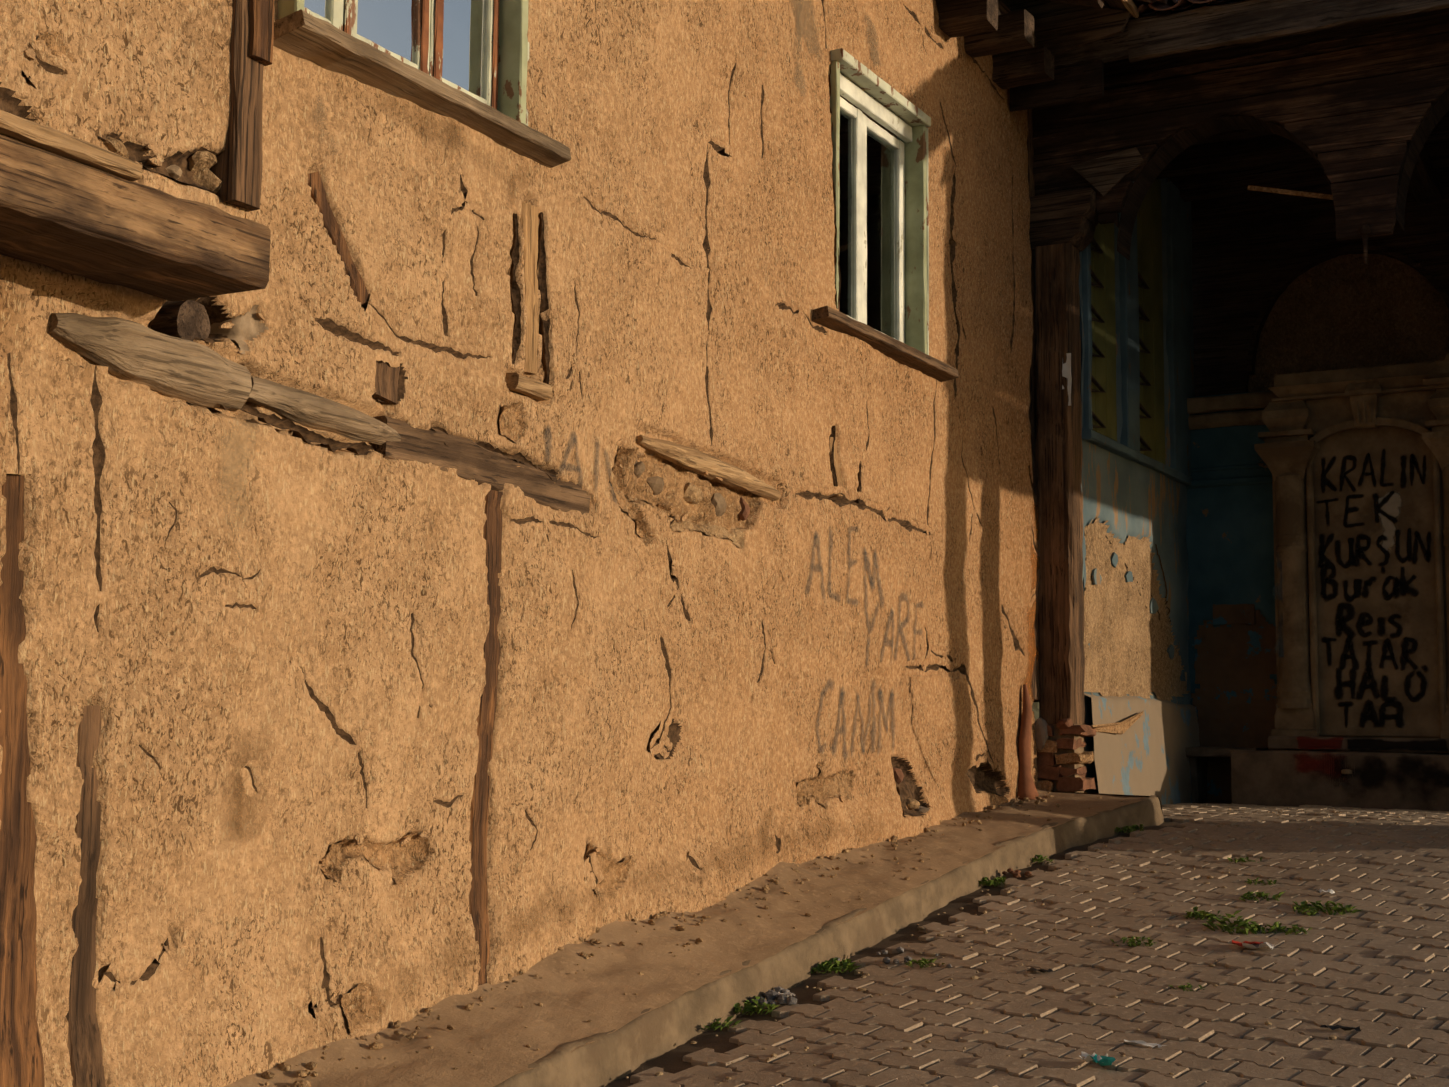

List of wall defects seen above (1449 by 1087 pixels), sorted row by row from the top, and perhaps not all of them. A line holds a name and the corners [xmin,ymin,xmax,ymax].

spalling [0,82,36,121]
spalling [102,132,225,196]
crack [313,171,587,403]
crack [581,56,768,446]
crack [79,364,115,641]
crack [220,404,374,455]
spalling [609,439,762,548]
crack [795,98,1038,661]
peeling [1084,517,1190,734]
crack [283,645,375,815]
spalling [319,830,435,884]
spalling [891,757,932,817]